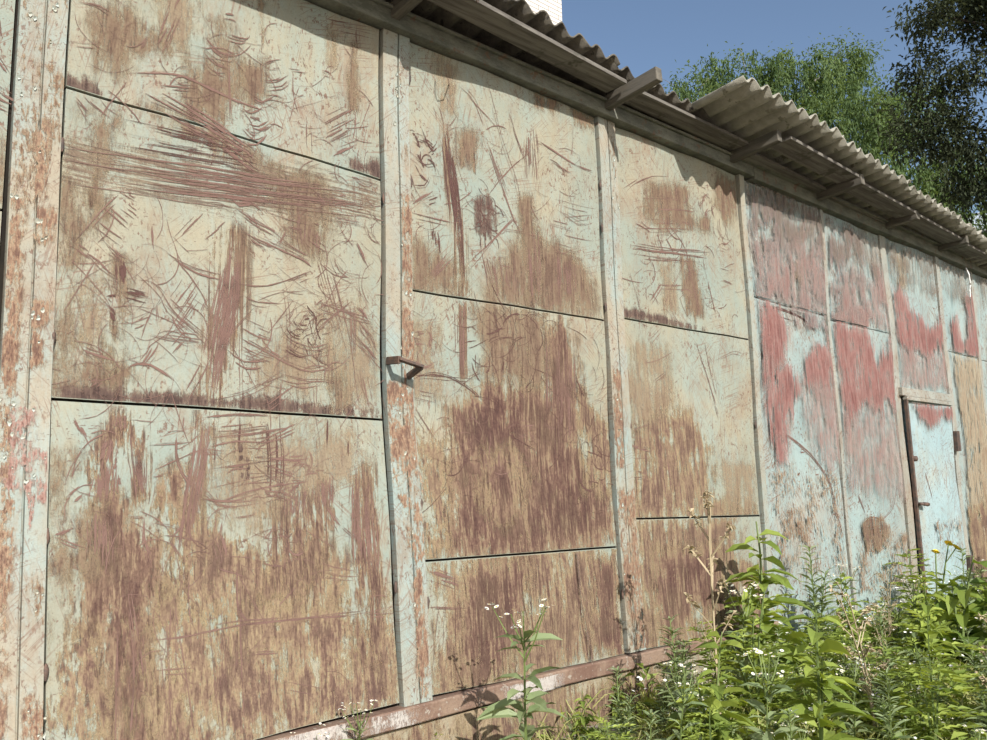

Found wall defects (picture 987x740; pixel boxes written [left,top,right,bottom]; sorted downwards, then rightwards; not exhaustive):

rust [67,0,194,96]
rust [533,92,559,112]
rust [571,108,594,129]
rust [643,181,711,232]
rust [715,172,737,224]
rust [624,256,705,331]
rust [412,122,625,694]
peeling [746,182,987,596]
rust [46,226,399,740]
rust [628,342,765,648]
rust [862,514,891,552]
rust [388,662,675,740]